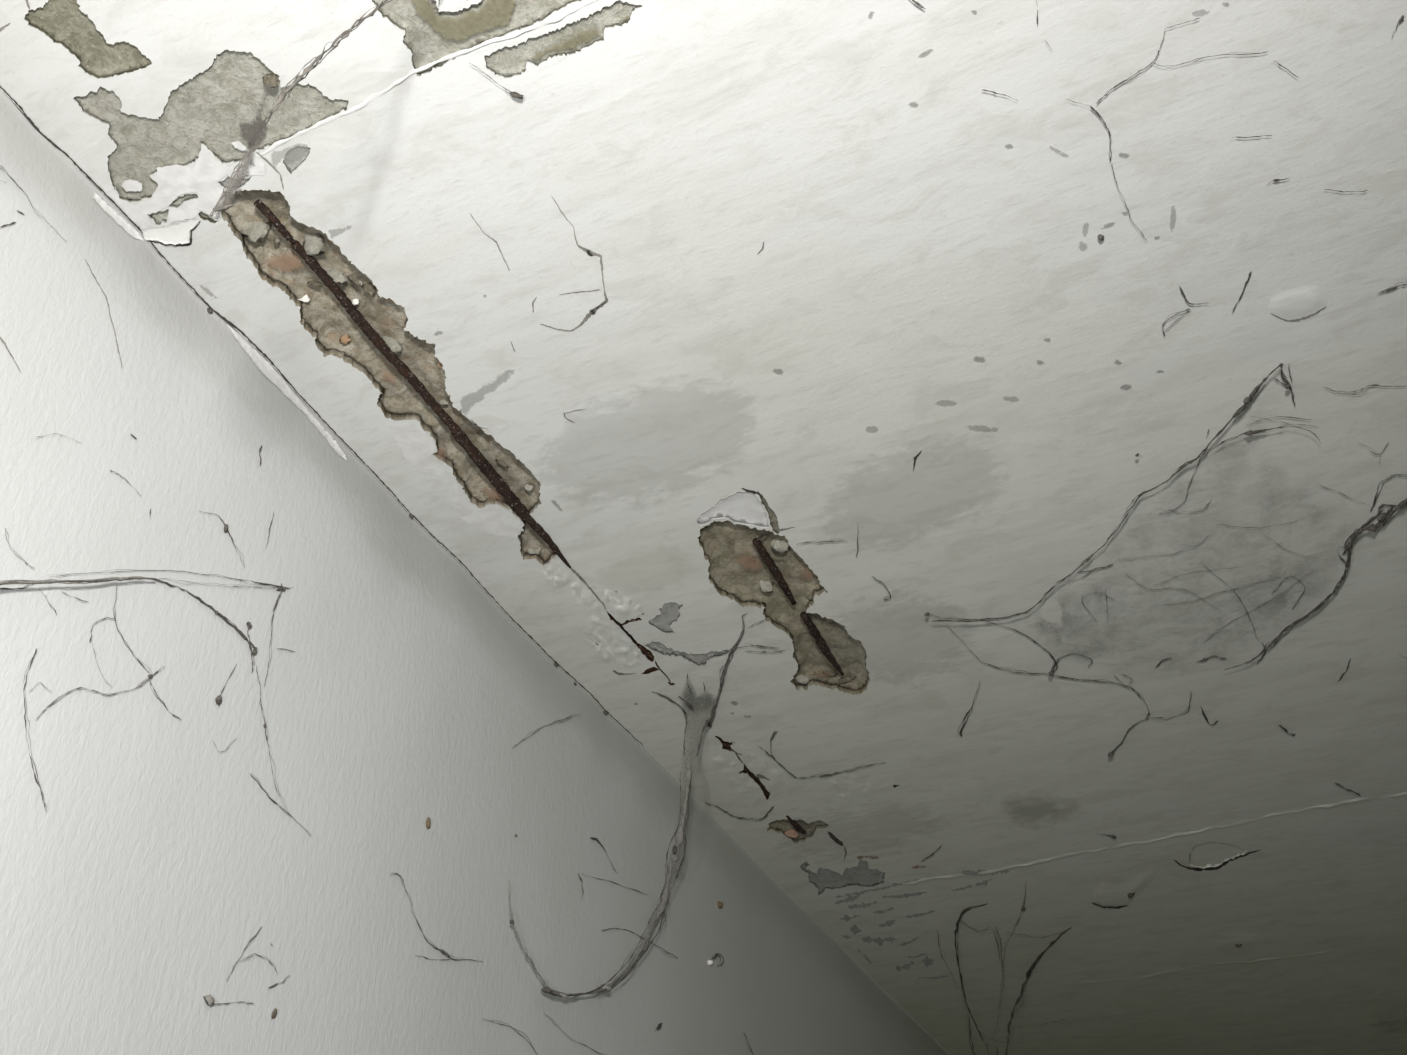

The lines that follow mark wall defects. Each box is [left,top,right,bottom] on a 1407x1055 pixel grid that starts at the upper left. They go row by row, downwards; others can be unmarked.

crack [0,86,675,746]
spalling [24,0,730,671]
spalling [697,491,870,695]
crack [715,736,770,800]
peeling [709,742,949,979]